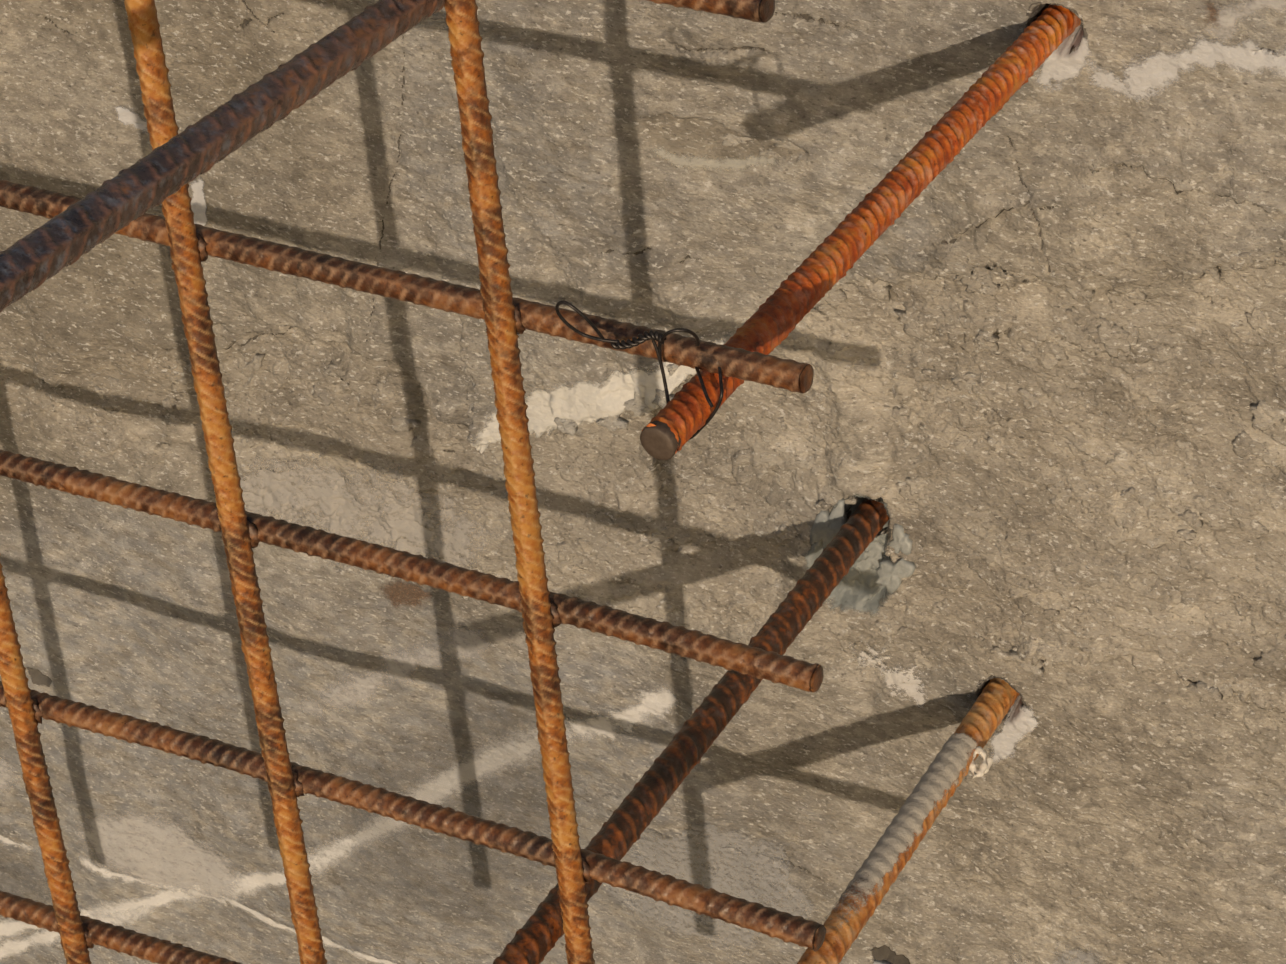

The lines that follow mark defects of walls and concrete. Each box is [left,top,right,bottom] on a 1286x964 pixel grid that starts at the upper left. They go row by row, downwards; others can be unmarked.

spalling [0,0,1020,964]
spalling [525,4,1286,713]
crack [941,136,1054,272]
water stain [1037,0,1286,103]